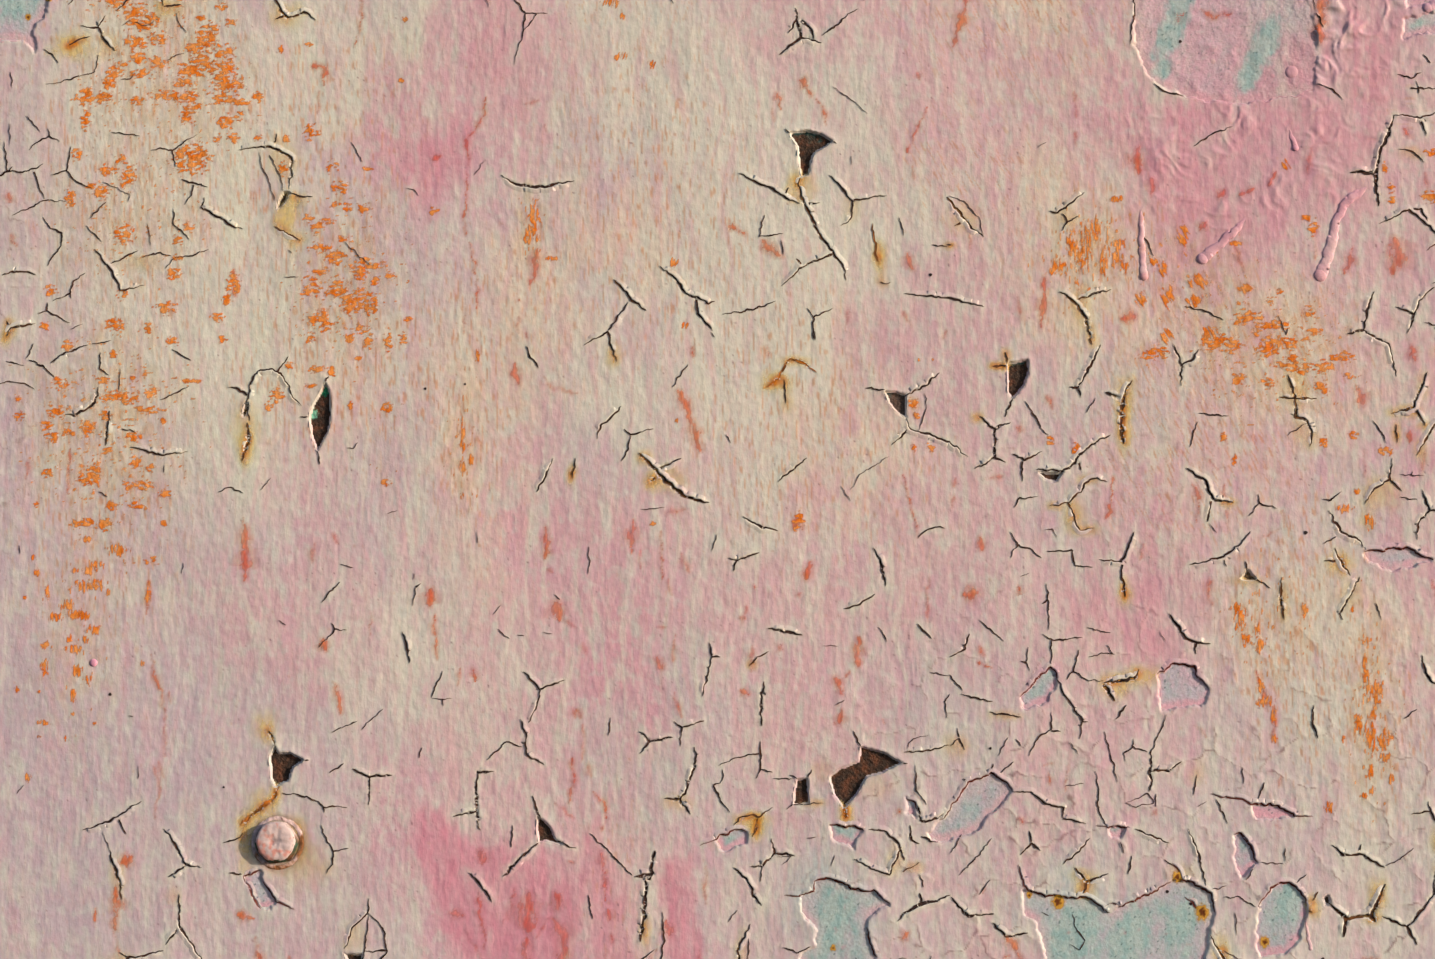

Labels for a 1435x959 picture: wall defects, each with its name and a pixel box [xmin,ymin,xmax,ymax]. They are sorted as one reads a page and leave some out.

peeling [1134,0,1319,105]
peeling [789,129,834,177]
corrosion [19,0,264,716]
crack [0,117,313,473]
crack [219,357,329,493]
corrosion [276,161,412,388]
crack [534,406,778,571]
corrosion [792,513,806,531]
corrosion [1028,195,1365,405]
crack [453,670,666,959]
peeling [828,746,903,848]
peeling [1018,861,1218,959]